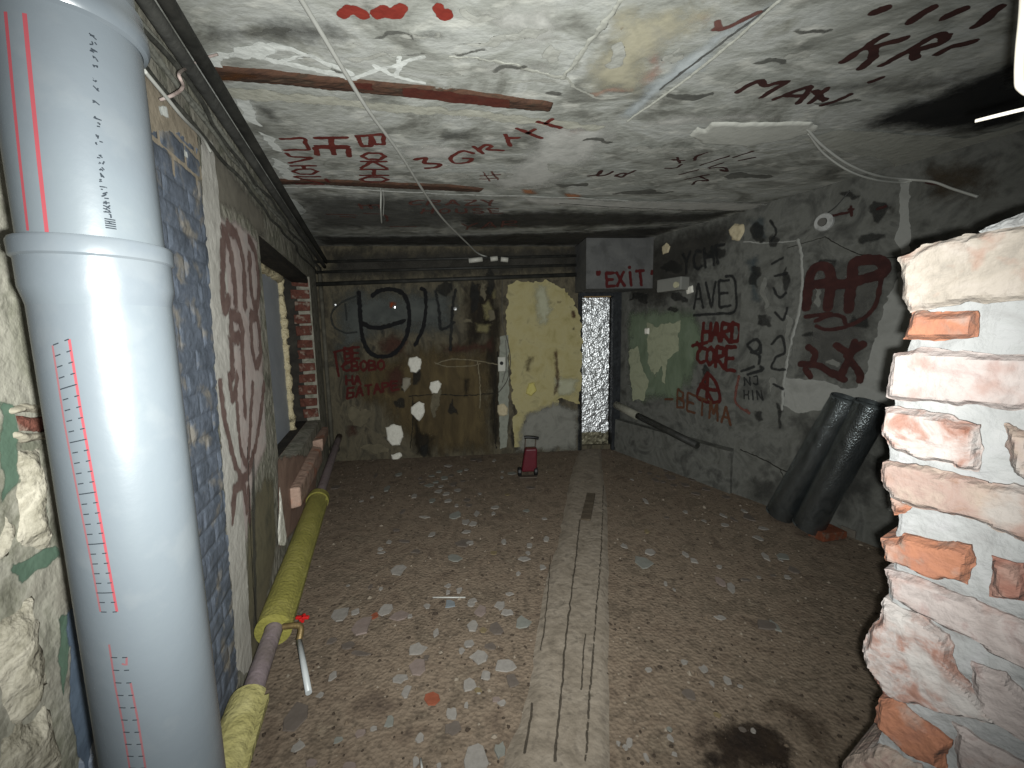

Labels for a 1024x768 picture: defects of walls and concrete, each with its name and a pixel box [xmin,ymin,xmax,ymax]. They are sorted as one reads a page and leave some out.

peeling [338,279,583,451]
peeling [628,311,701,401]
spalling [0,402,60,583]
spalling [0,596,61,768]
leakage [704,723,790,768]